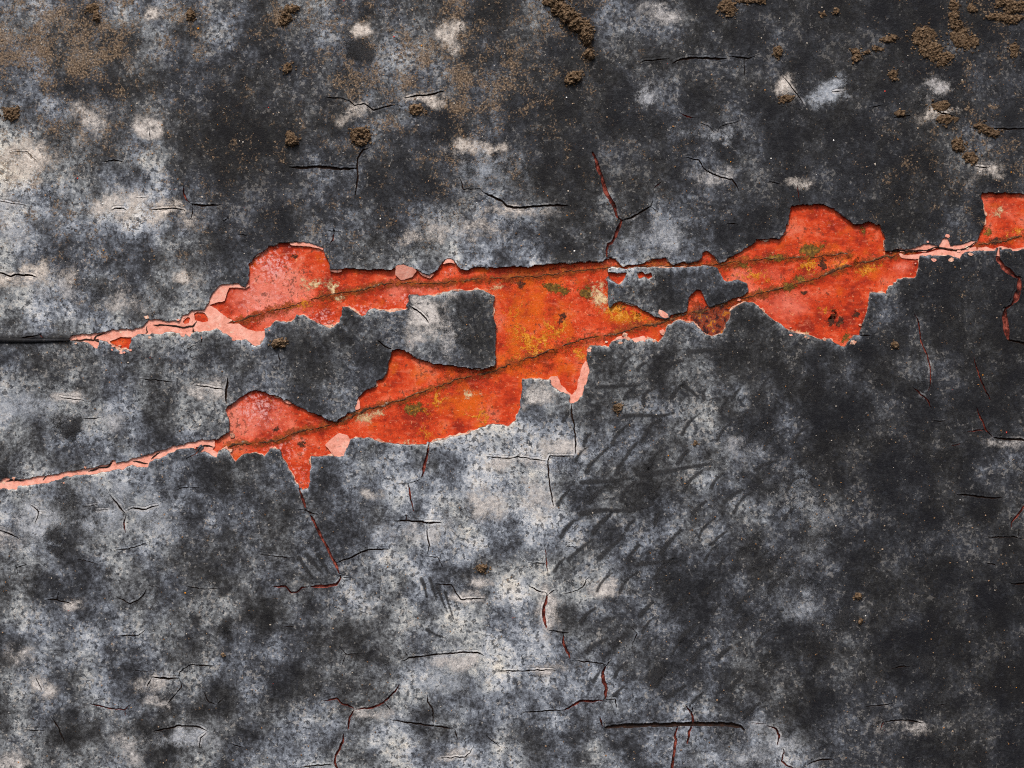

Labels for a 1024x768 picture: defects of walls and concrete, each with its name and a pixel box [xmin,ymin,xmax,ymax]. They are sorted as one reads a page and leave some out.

crack [324,89,446,113]
crack [288,146,372,198]
crack [458,176,569,211]
crack [590,150,663,259]
peeling [0,193,1024,490]
crack [994,247,1024,347]
crack [485,403,579,508]
crack [75,485,200,566]
crack [256,488,390,595]
crack [395,442,485,602]
crack [89,662,246,749]
crack [300,545,835,768]